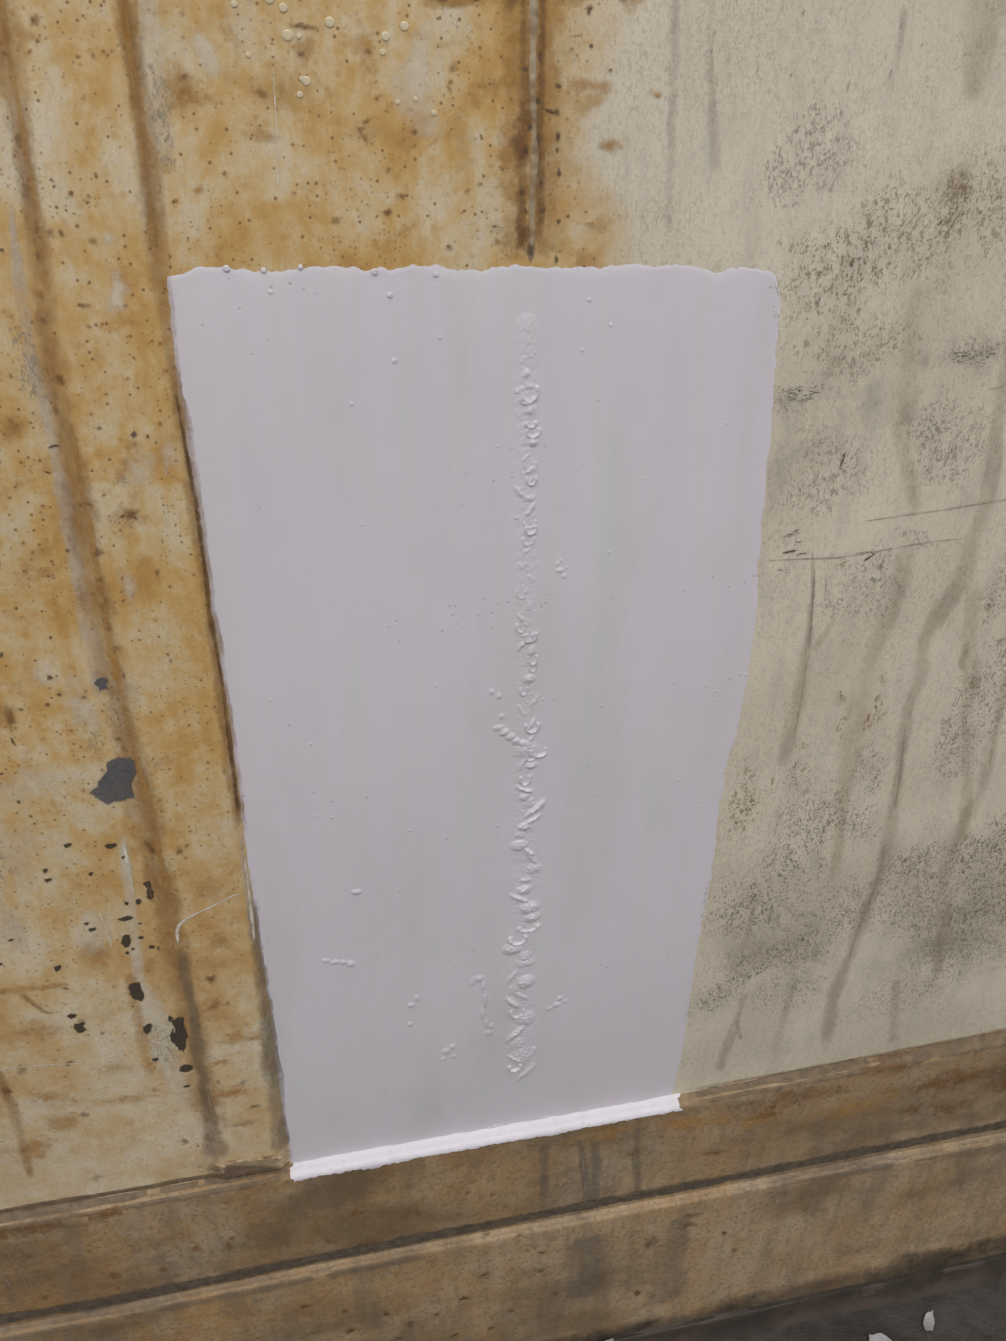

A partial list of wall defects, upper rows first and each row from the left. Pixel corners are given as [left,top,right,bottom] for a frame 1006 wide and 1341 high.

rust [10,61,36,234]
rust [504,0,555,241]
rust [175,379,244,818]
peeling [90,742,136,804]
rust [74,507,177,908]
rust [254,916,266,984]
rust [263,1011,281,1082]